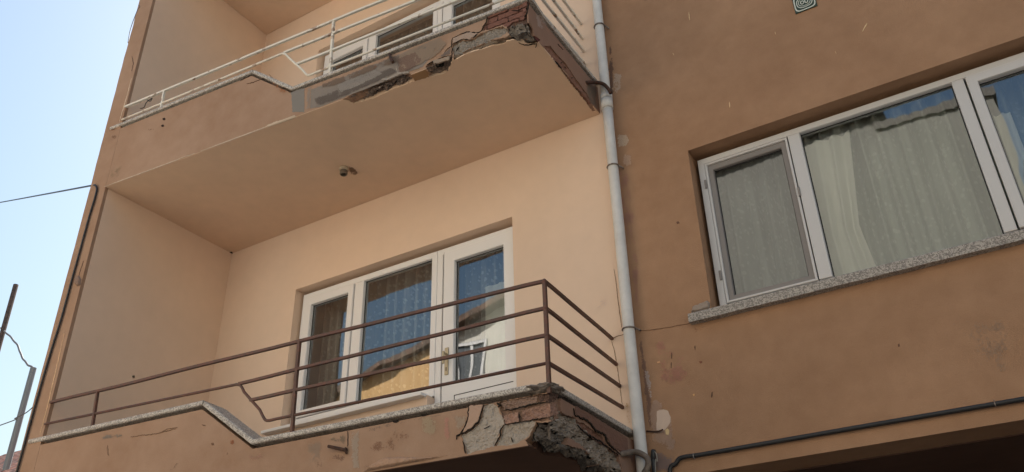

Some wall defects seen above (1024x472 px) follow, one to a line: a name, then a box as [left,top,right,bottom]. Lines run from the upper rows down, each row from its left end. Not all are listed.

flaking render [349,1,591,104]
flaking render [463,405,483,432]
crack [456,401,548,454]
spalling [501,395,628,472]
crack [573,408,621,455]
peeling [645,361,675,450]